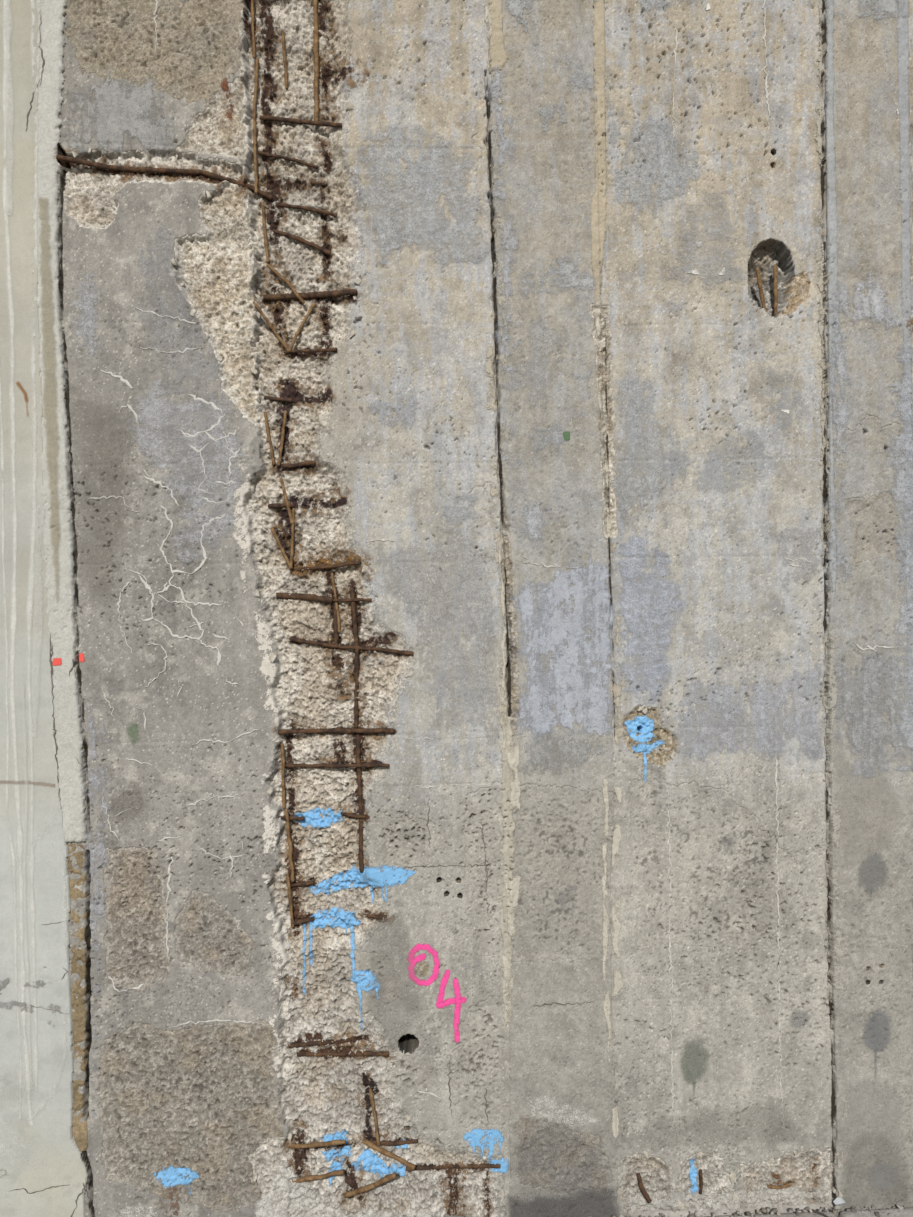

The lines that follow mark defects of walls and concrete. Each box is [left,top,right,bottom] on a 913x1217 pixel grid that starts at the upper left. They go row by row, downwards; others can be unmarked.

crack [486,88,504,523]
peeling [610,112,700,217]
crack [49,170,244,877]
spalling [56,0,515,1217]
crack [504,537,615,737]
peeling [496,213,913,778]
crack [822,241,830,821]
crack [29,908,144,1115]
rust [281,1031,413,1208]
rust [408,1159,495,1217]
spalling [514,1113,846,1214]
crack [826,850,837,1198]